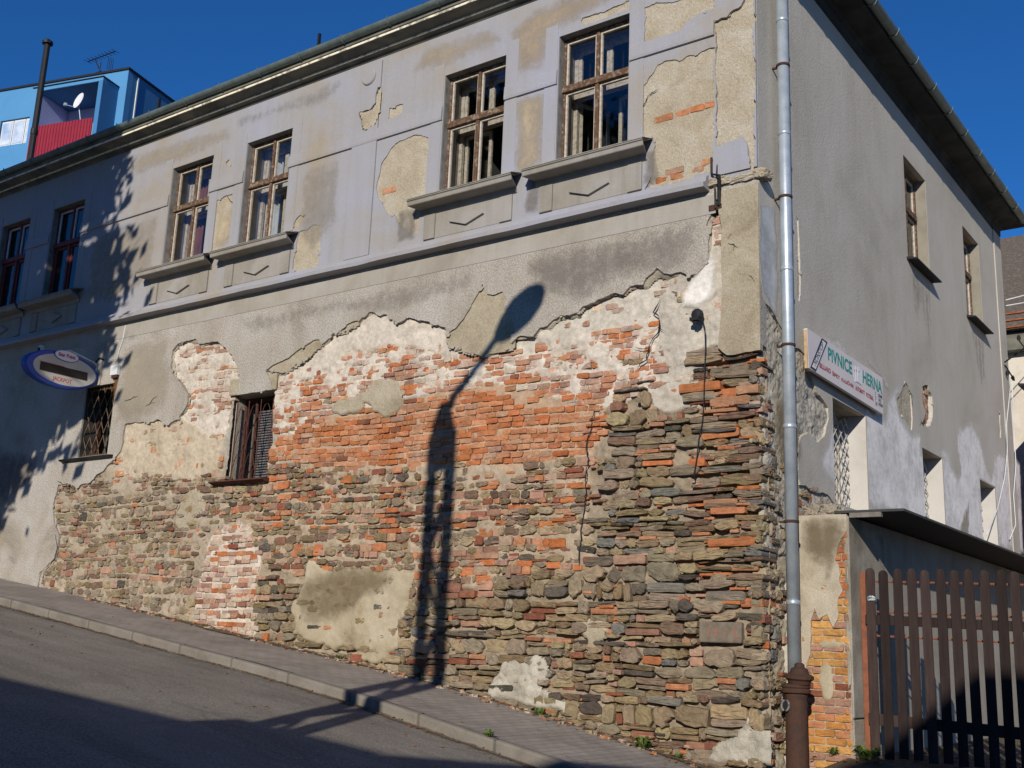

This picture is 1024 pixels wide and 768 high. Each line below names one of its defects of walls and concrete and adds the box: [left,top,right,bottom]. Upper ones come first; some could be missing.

spalling [360,87,403,130]
spalling [377,135,429,234]
spalling [643,0,759,188]
spalling [40,195,832,768]
spalling [897,381,934,429]
spalling [802,532,853,768]